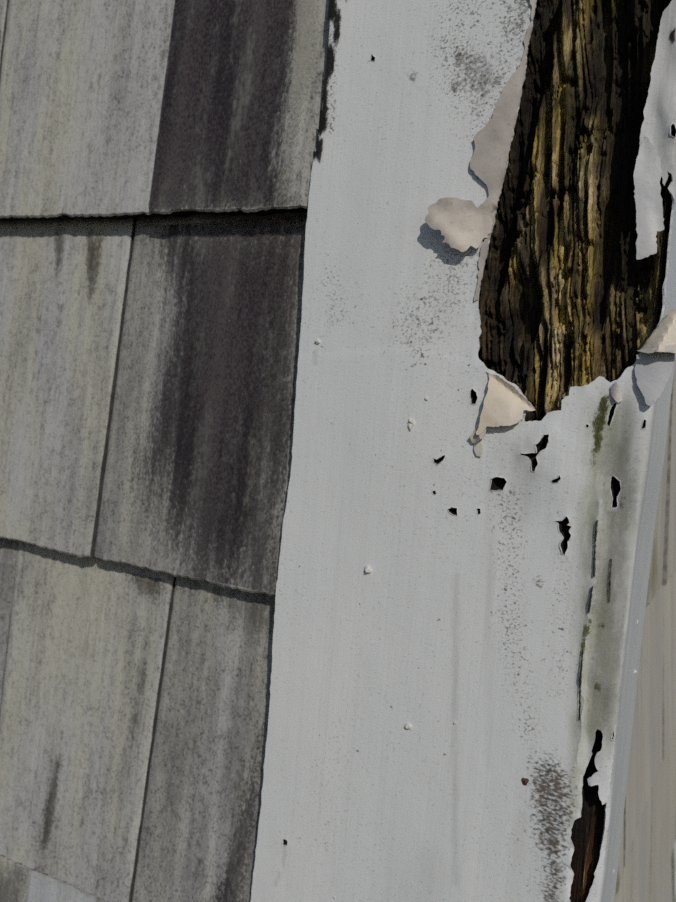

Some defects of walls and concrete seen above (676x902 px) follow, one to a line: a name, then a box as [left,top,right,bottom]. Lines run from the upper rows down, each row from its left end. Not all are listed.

water stain [86,231,103,297]
water stain [148,0,341,210]
peeling [425,0,536,301]
peeling [633,136,664,260]
water stain [128,215,307,633]
peeling [469,371,535,457]
peeling [634,309,676,406]
water stain [38,761,61,853]
water stain [214,736,262,902]
water stain [531,758,575,902]